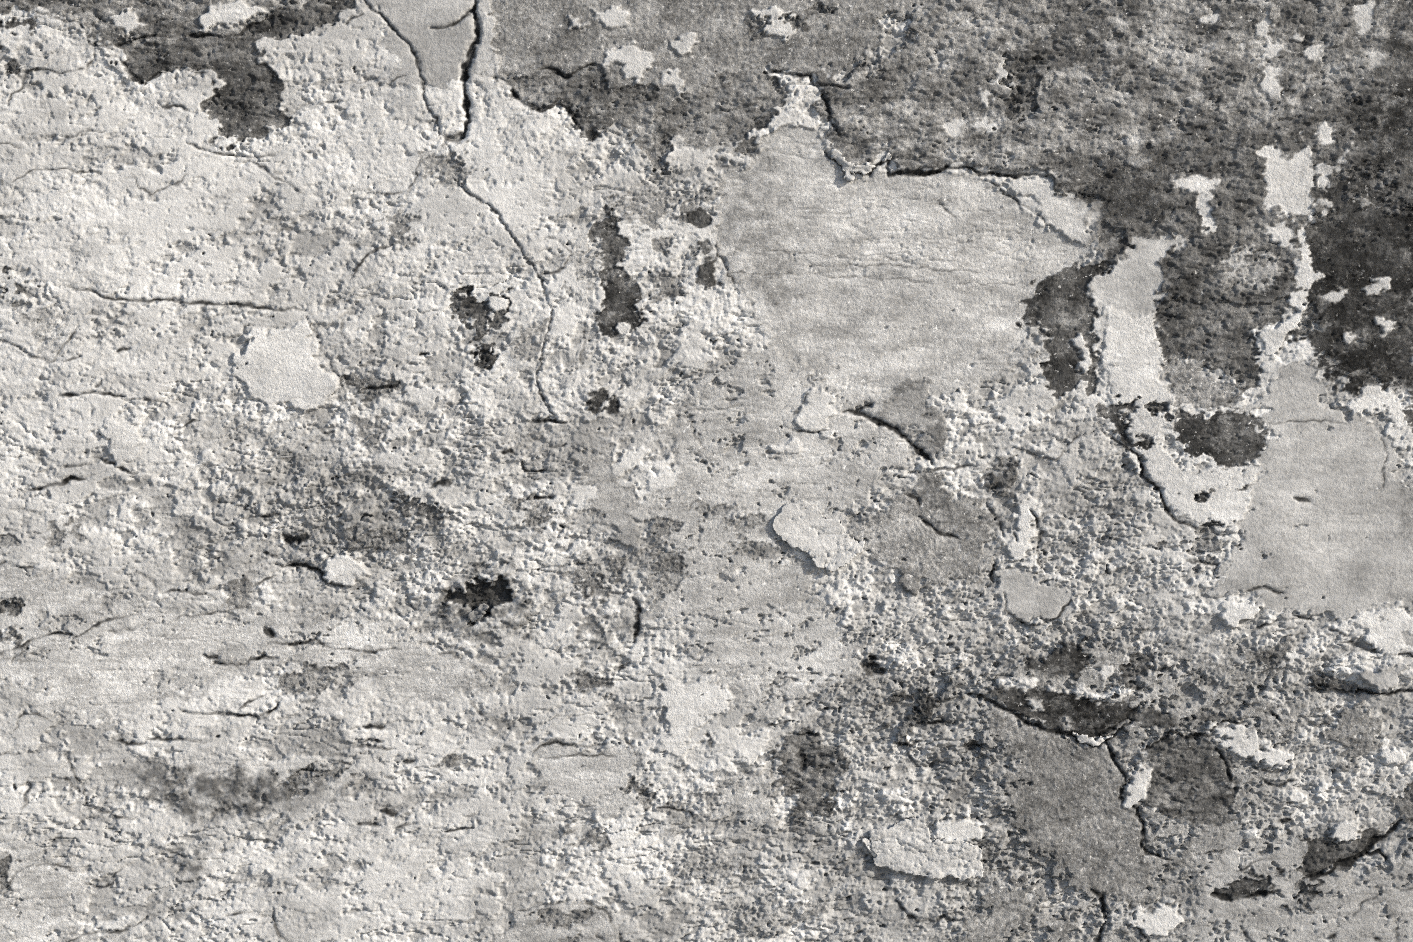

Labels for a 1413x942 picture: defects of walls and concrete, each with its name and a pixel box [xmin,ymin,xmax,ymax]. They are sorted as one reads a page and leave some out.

spalling [0,0,355,145]
crack [348,0,590,133]
crack [354,247,386,273]
peeling [230,321,400,447]
crack [338,375,400,389]
crack [455,180,568,499]
spalling [359,0,1413,767]
crack [431,480,452,488]
peeling [0,533,498,723]
peeling [532,727,851,850]
crack [899,719,946,764]
spalling [862,635,1413,942]